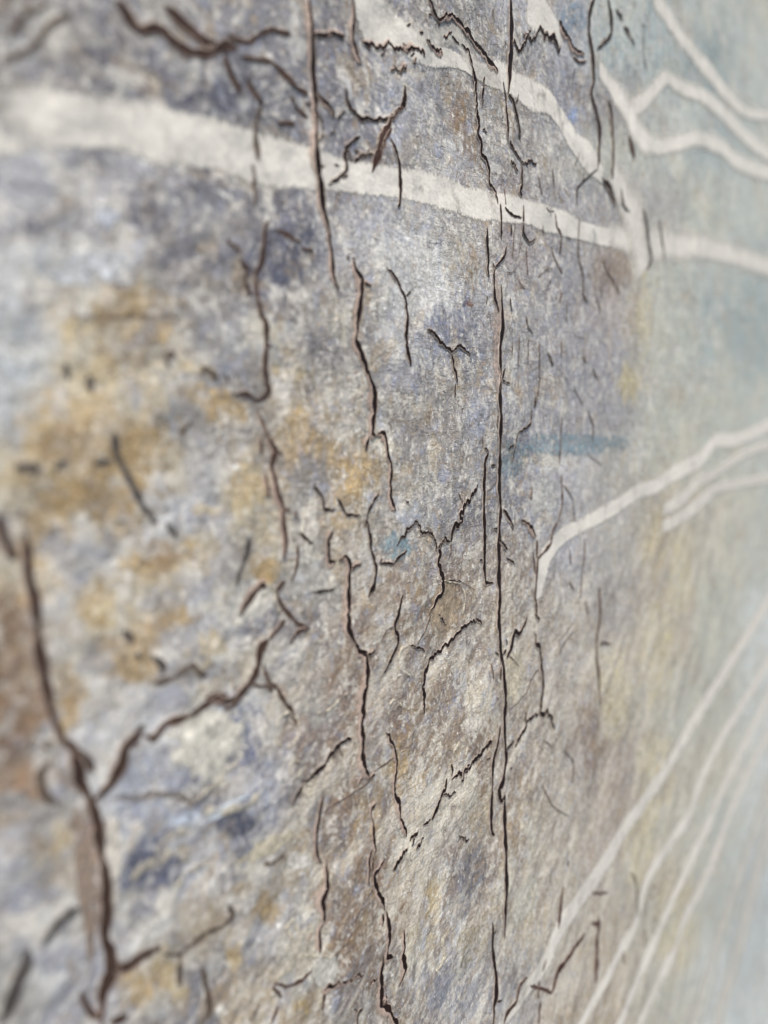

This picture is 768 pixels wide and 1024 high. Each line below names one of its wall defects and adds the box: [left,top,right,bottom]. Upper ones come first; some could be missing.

crack [0,220,313,1024]
crack [116,0,647,1024]
crack [643,209,665,269]